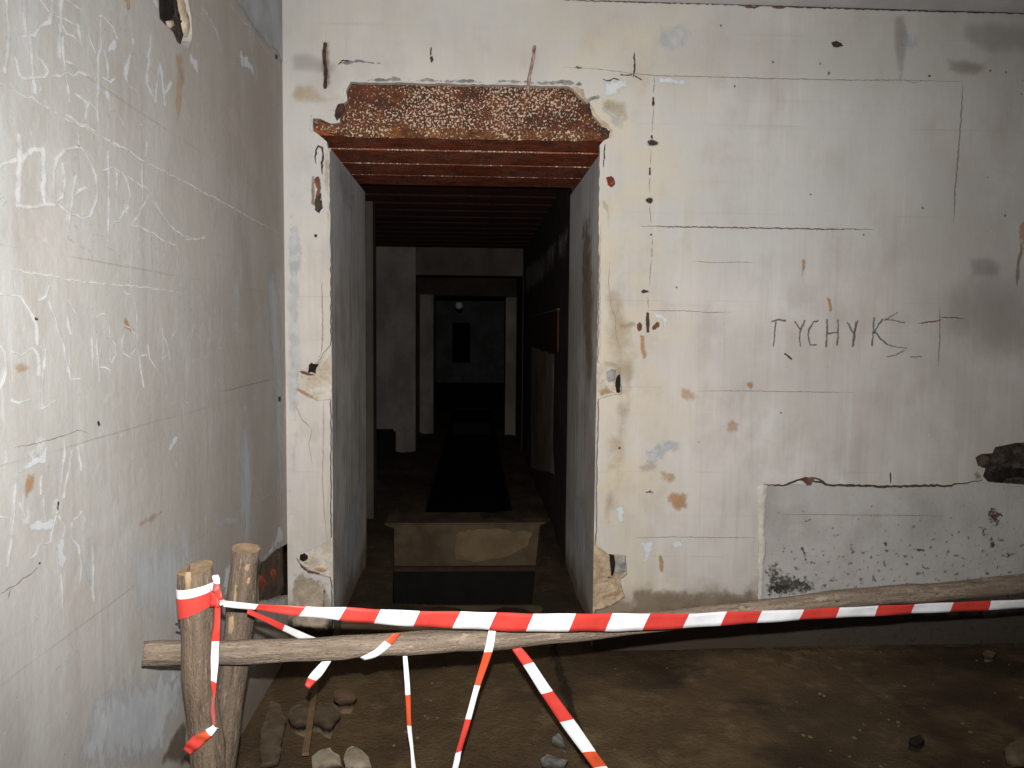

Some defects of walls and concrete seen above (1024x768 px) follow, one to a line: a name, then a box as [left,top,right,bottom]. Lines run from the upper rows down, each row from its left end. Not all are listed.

spalling [152,0,190,44]
rust [315,120,615,187]
rust [312,145,324,213]
spalling [297,341,332,403]
spalling [596,361,621,402]
rust [670,494,686,509]
crack [764,472,982,488]
spalling [976,443,1024,484]
spalling [258,527,333,631]
spalling [593,538,627,614]
mould [768,565,812,595]